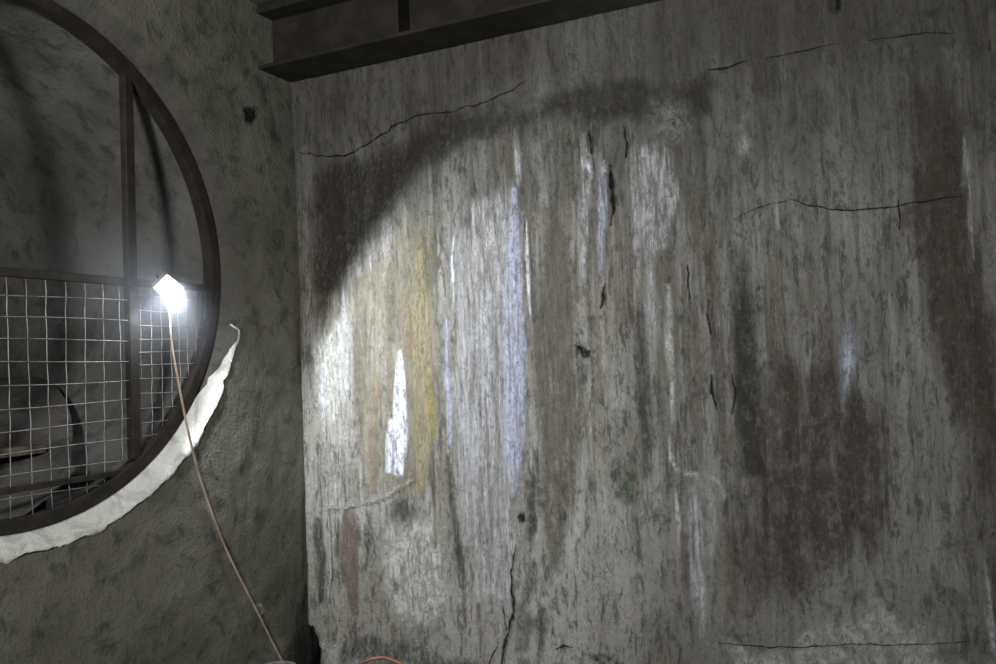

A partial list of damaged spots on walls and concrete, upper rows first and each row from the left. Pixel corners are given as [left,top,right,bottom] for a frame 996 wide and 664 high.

damp [546,83,710,122]
damp [581,149,606,278]
damp [314,110,519,497]
damp [445,144,576,602]
damp [735,280,882,592]
damp [385,525,445,622]
crack [489,546,516,664]